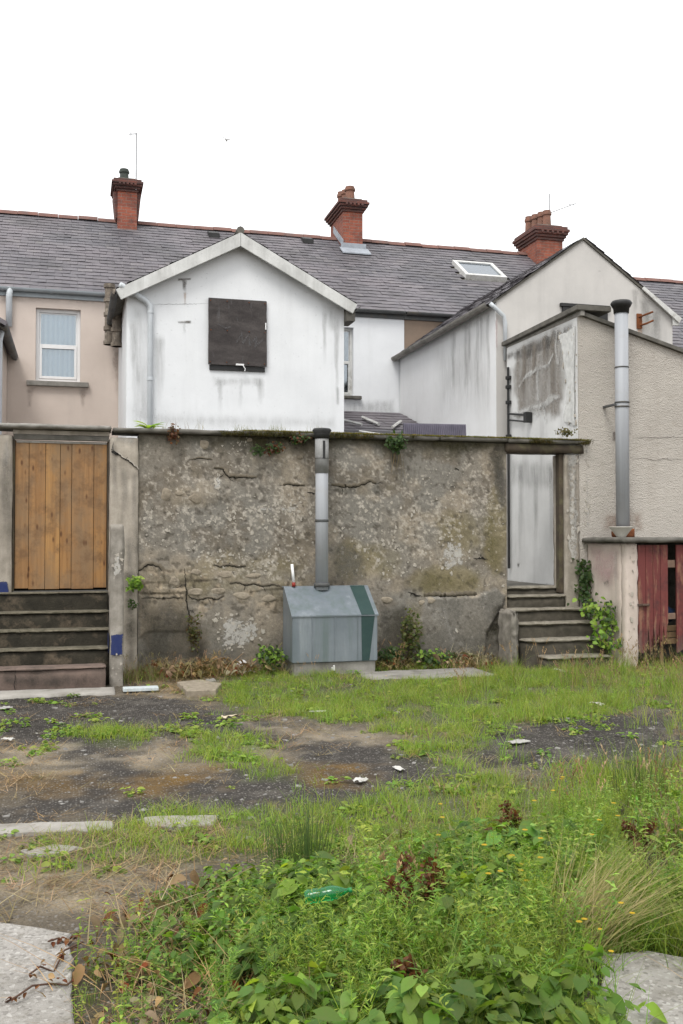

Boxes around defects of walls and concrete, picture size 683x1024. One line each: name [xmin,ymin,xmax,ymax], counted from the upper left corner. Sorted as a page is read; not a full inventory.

leakage [515,334,562,414]
crack [111,443,139,470]
crack [189,456,381,494]
crack [138,561,281,629]